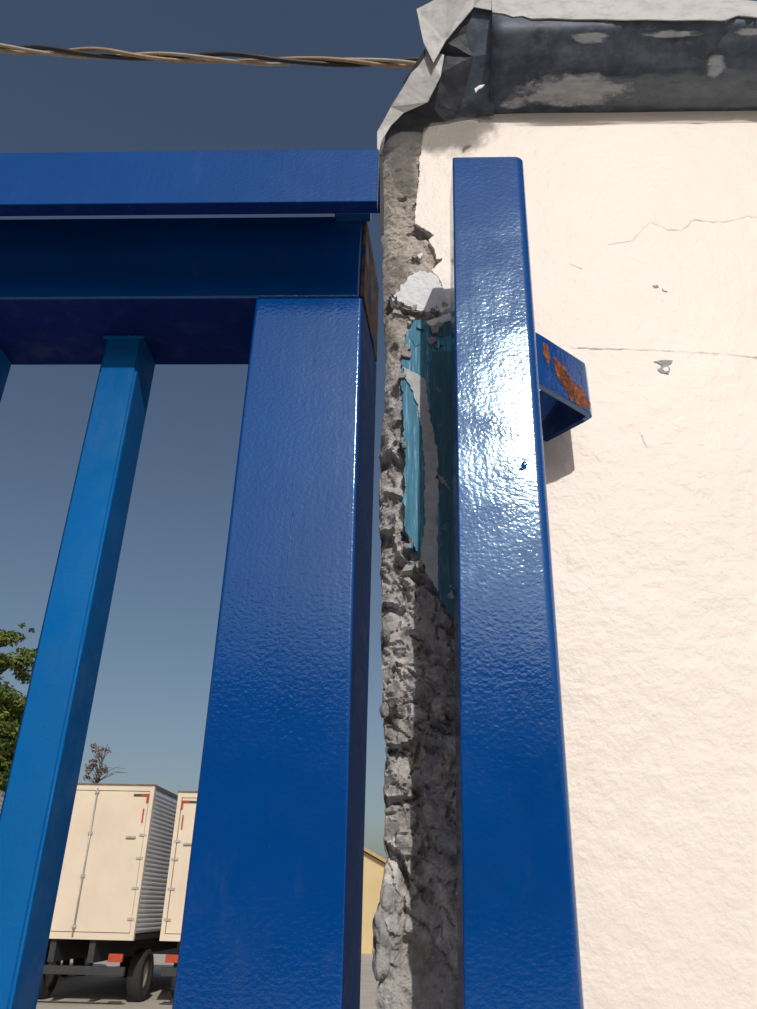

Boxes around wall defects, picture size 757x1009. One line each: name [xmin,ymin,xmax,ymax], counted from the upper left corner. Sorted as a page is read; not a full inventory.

spalling [372,137,458,1009]
rust [543,342,591,408]